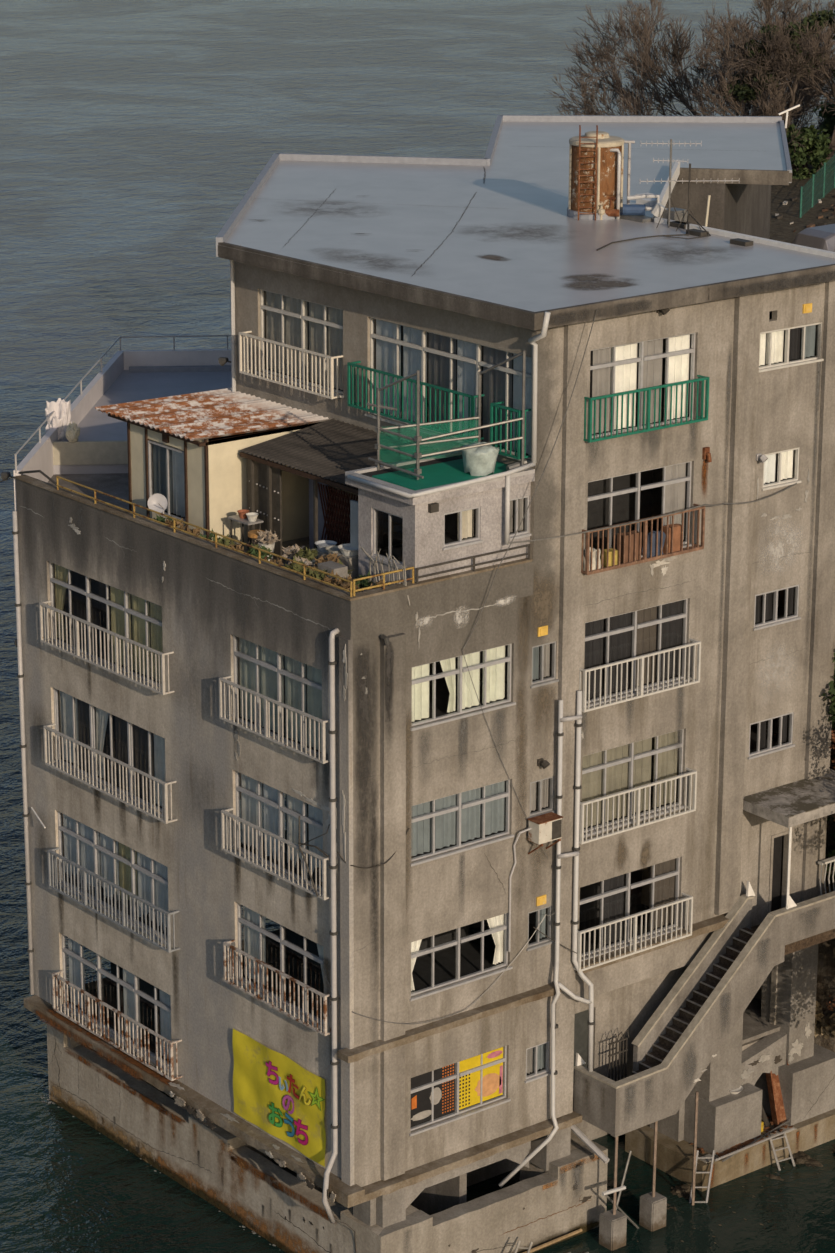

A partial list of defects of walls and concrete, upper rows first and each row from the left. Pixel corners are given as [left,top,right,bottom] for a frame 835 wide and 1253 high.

damp [314,754,330,790]
rust [35,1009,196,1137]
rust [50,1086,329,1253]
crack [477,1196,590,1252]